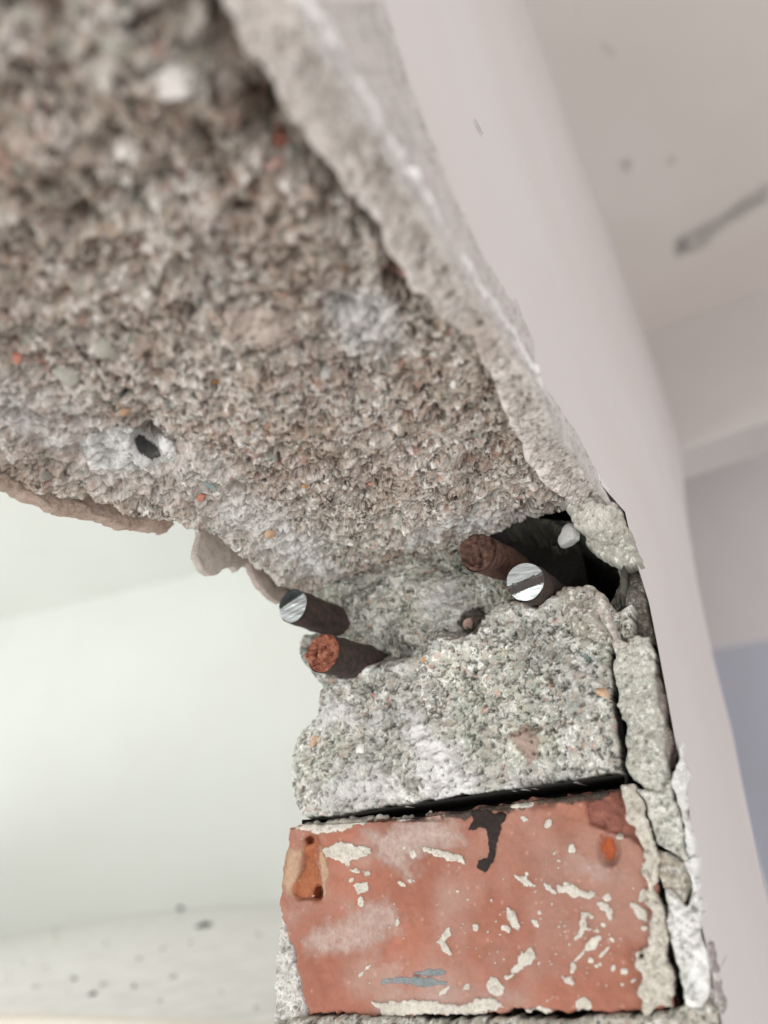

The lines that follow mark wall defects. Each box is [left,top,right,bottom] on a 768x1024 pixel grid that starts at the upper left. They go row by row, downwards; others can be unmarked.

peeling [190,529,290,605]
spalling [489,517,631,612]
spalling [457,606,485,634]
crack [302,686,644,825]
spalling [585,792,625,833]
rust [282,835,329,901]
crack [660,879,668,910]
crack [633,941,685,1014]
crack [401,1008,602,1020]